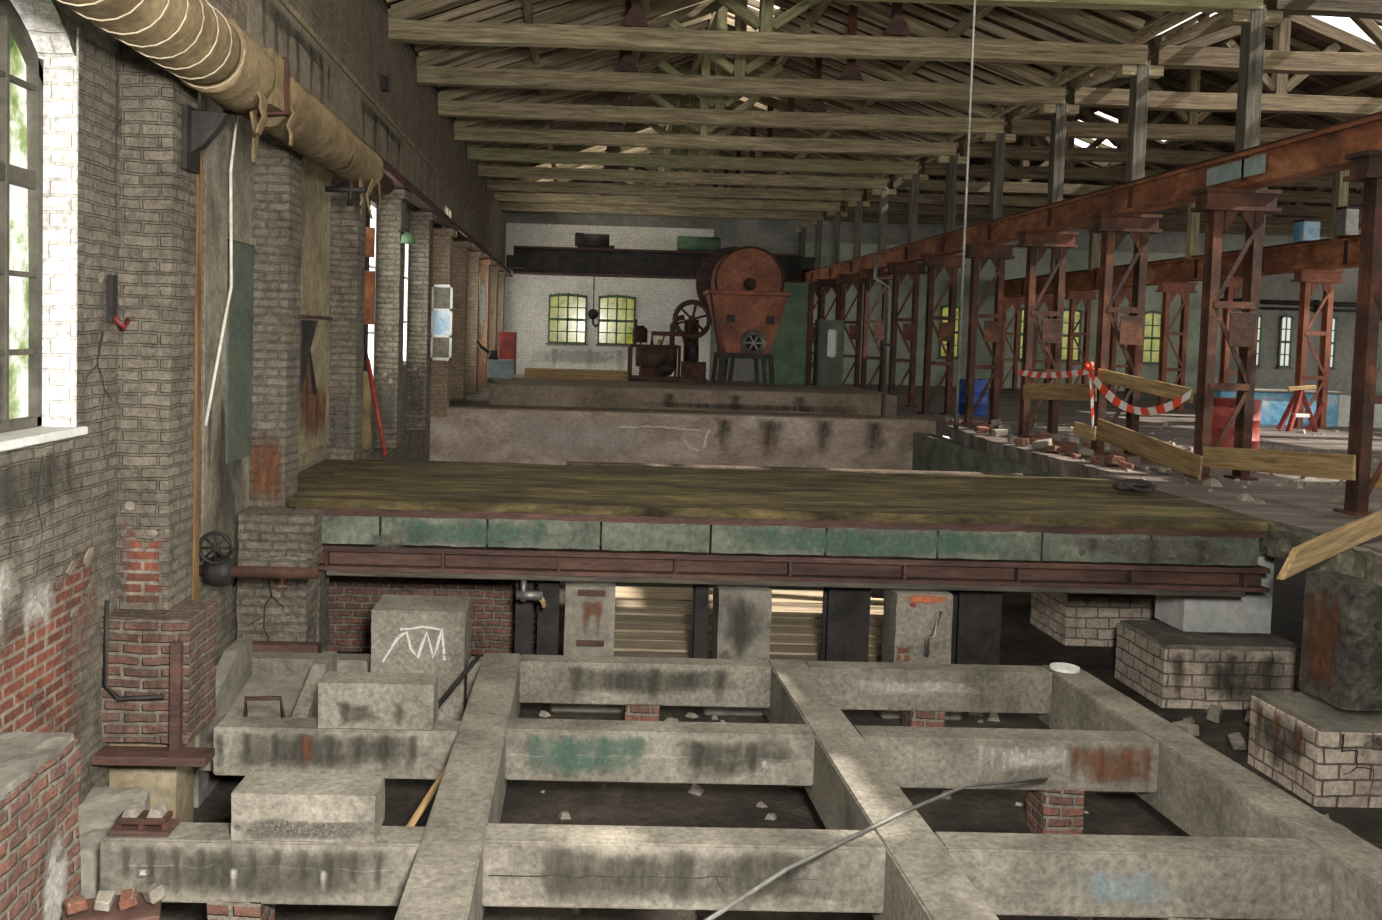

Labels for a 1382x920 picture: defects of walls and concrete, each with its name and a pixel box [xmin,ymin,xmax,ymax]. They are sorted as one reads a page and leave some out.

leakage [668,394,839,443]
flaking render [125,500,160,602]
leakage [25,588,48,630]
flaking render [0,547,94,733]
leakage [511,738,792,773]